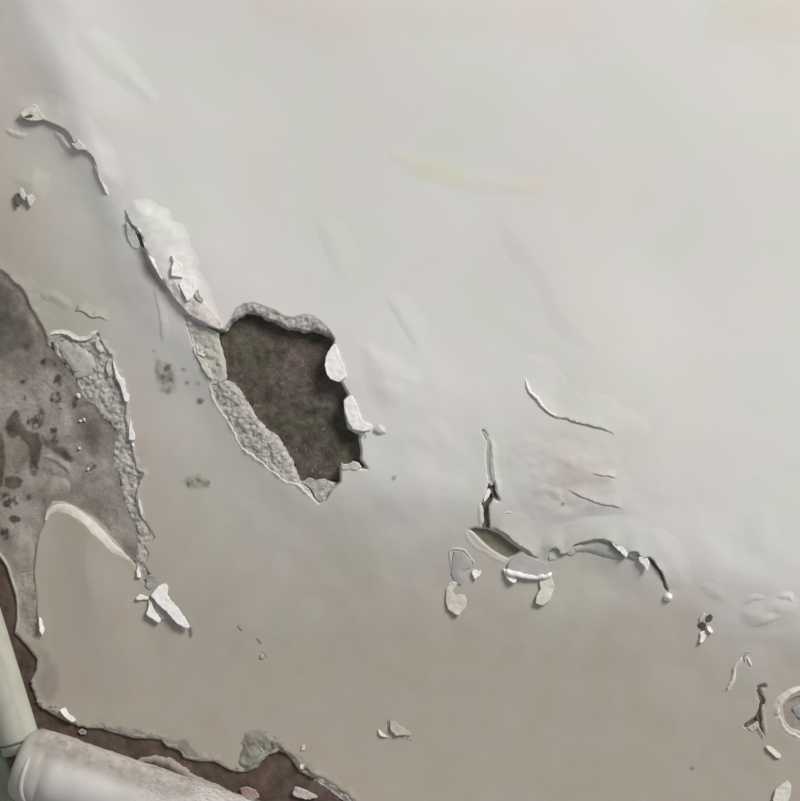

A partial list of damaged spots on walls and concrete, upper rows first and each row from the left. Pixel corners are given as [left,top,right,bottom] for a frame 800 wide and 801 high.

peeling [21,104,45,121]
flaking render [124,199,387,506]
crack [525,354,652,436]
peeling [0,257,361,801]
peeling [446,510,693,616]